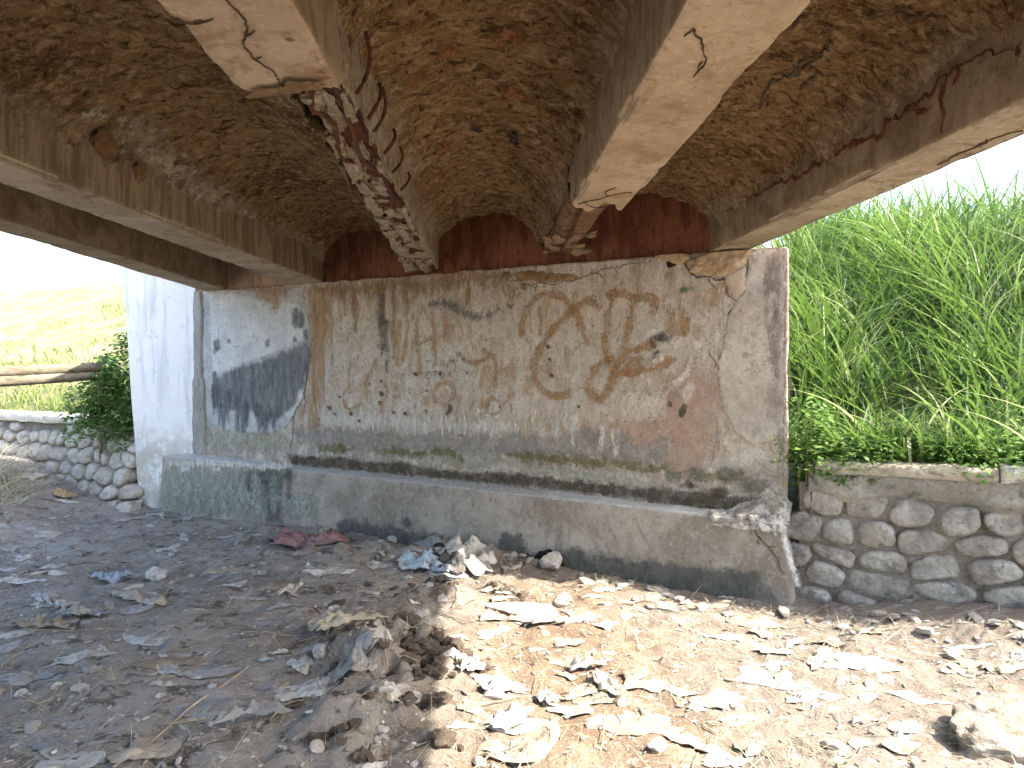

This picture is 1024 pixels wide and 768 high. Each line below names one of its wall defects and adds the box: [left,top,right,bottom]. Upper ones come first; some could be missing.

crack [176,0,283,87]
crack [684,28,707,78]
crack [758,6,925,109]
spalling [246,31,437,273]
crack [729,43,1023,211]
spalling [542,208,597,256]
crack [578,187,632,208]
peeling [203,286,312,434]
water stain [765,254,791,418]
water stain [292,405,768,493]
water stain [247,464,292,525]
spalling [707,488,792,533]